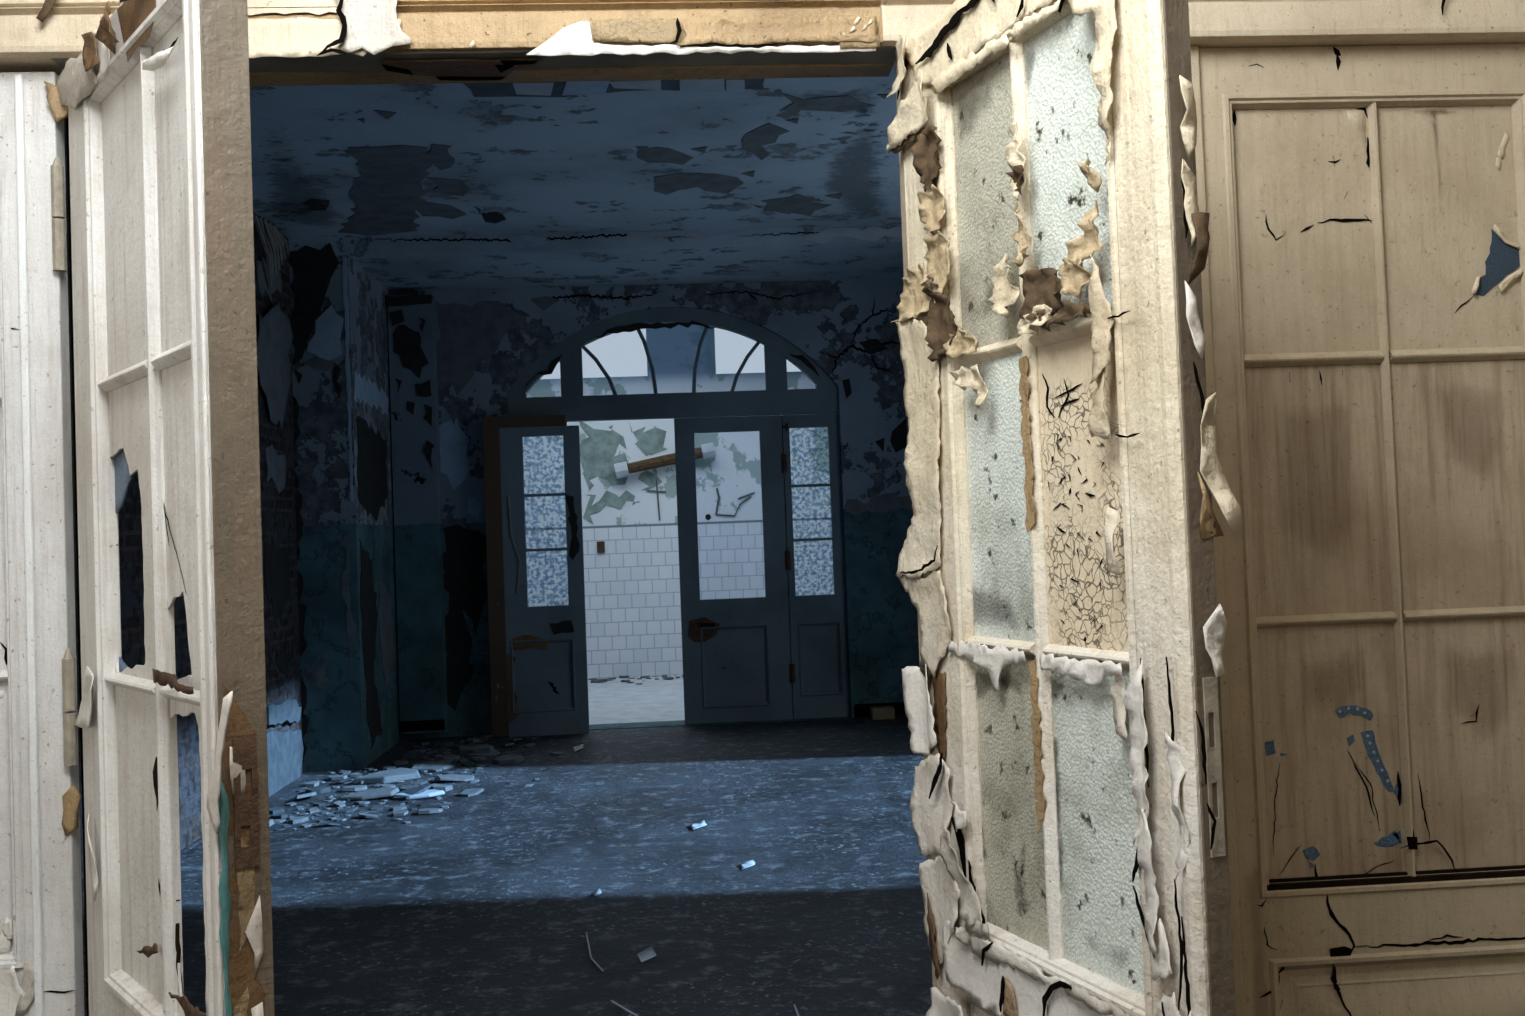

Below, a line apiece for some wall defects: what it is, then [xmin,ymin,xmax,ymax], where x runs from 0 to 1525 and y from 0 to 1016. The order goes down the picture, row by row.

peeling [81,0,156,79]
peeling [527,0,1117,195]
crack [1265,108,1372,240]
peeling [1493,223,1523,293]
peeling [1088,254,1115,439]
flaking render [256,144,506,763]
peeling [579,421,666,525]
crack [1042,374,1139,642]
peeling [859,319,1191,1016]
peeling [0,963,34,1016]
crack [1258,899,1285,1009]
crack [1315,864,1525,1016]